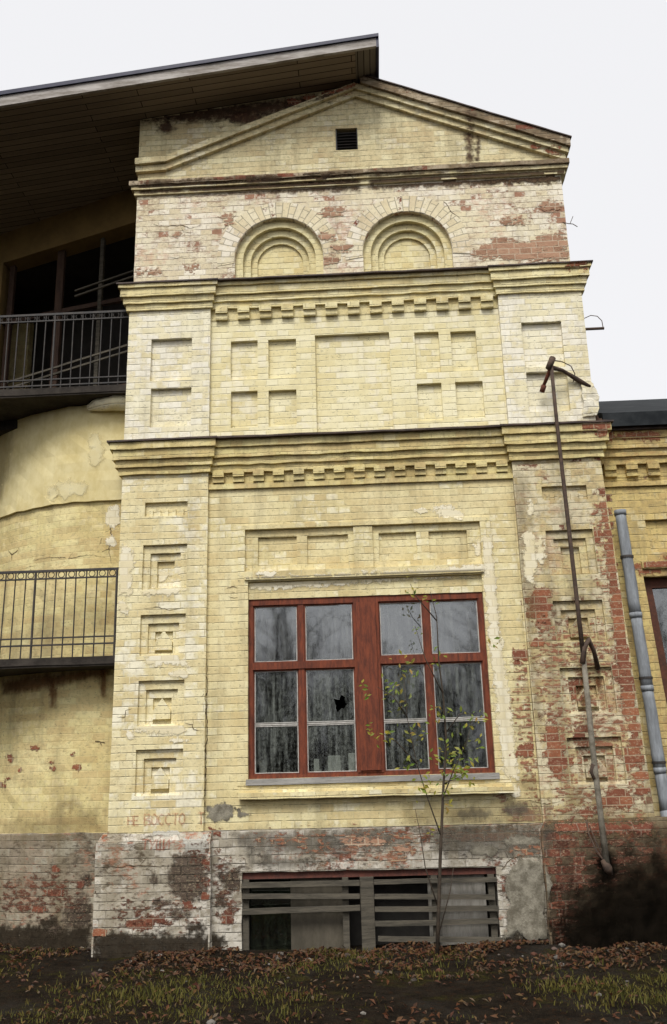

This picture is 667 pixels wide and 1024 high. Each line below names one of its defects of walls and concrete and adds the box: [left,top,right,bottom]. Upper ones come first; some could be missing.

damp [139,114,565,197]
peeling [470,199,588,272]
peeling [242,487,667,944]
spalling [0,802,251,938]
damp [551,844,667,926]